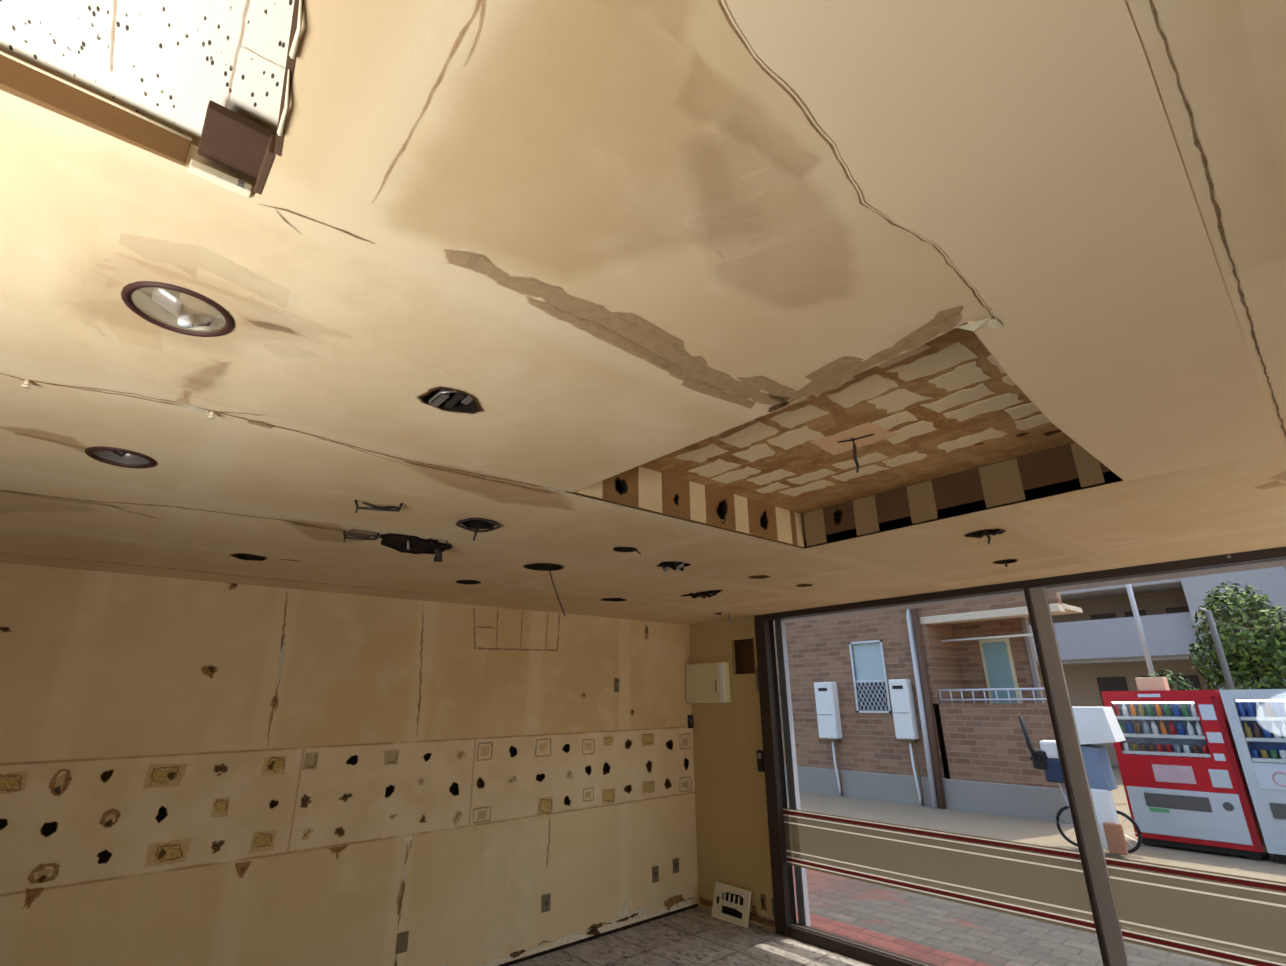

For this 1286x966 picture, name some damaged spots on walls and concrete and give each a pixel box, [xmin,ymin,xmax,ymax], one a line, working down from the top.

crack [376,0,484,196]
crack [1149,0,1286,437]